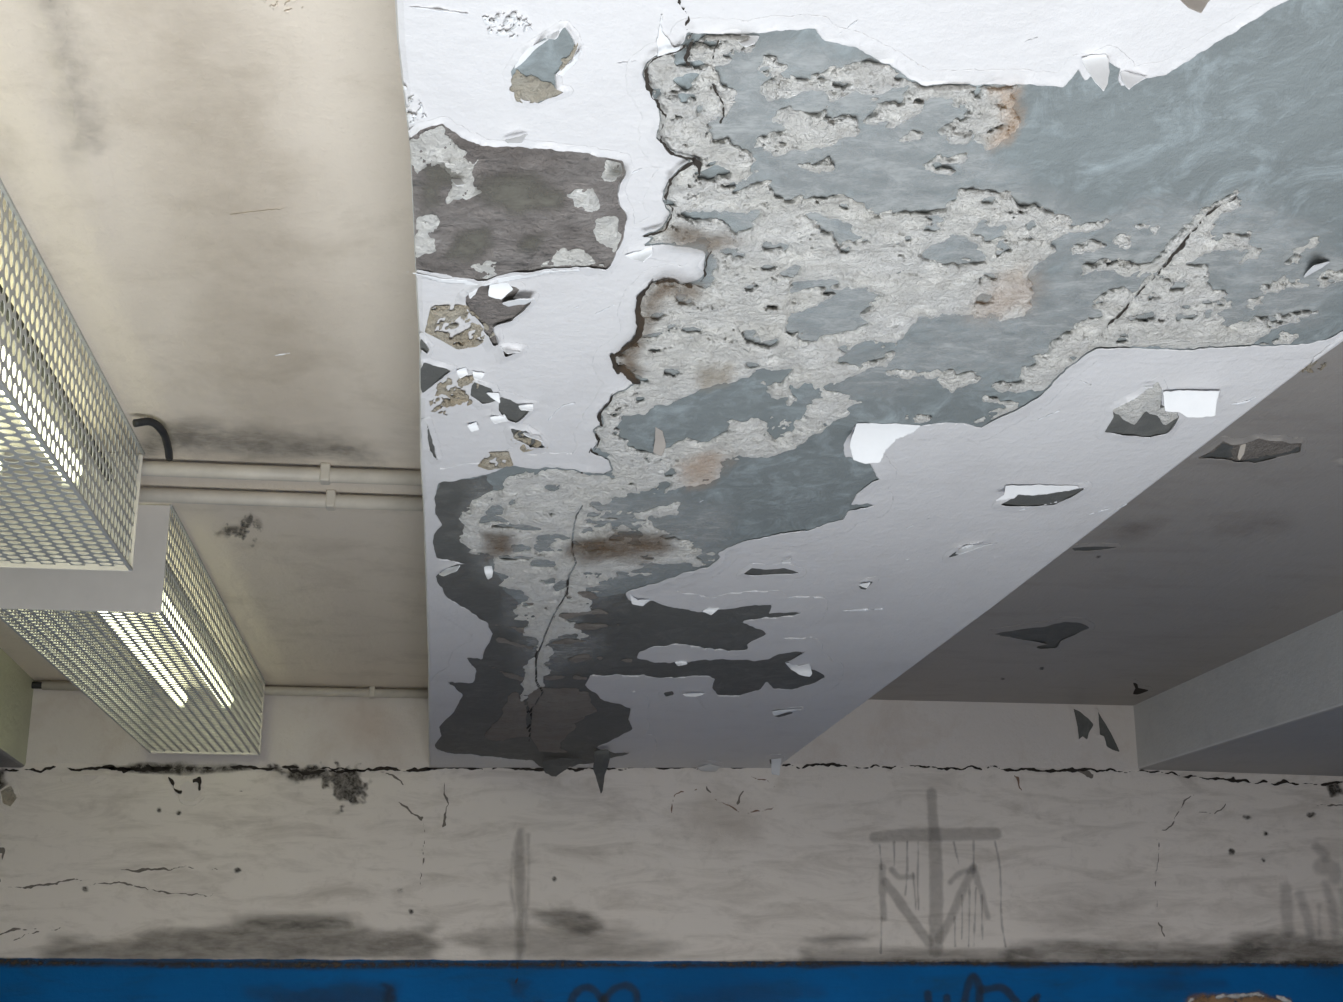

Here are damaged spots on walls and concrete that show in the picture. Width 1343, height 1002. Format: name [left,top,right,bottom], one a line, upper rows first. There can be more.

crack [643,0,725,237]
crack [1101,196,1237,336]
crack [581,251,712,474]
peeling [403,0,1343,793]
crack [5,506,622,884]
leakage [126,764,246,774]
leakage [269,762,367,807]
crack [656,762,1343,887]
leakage [1327,783,1342,797]